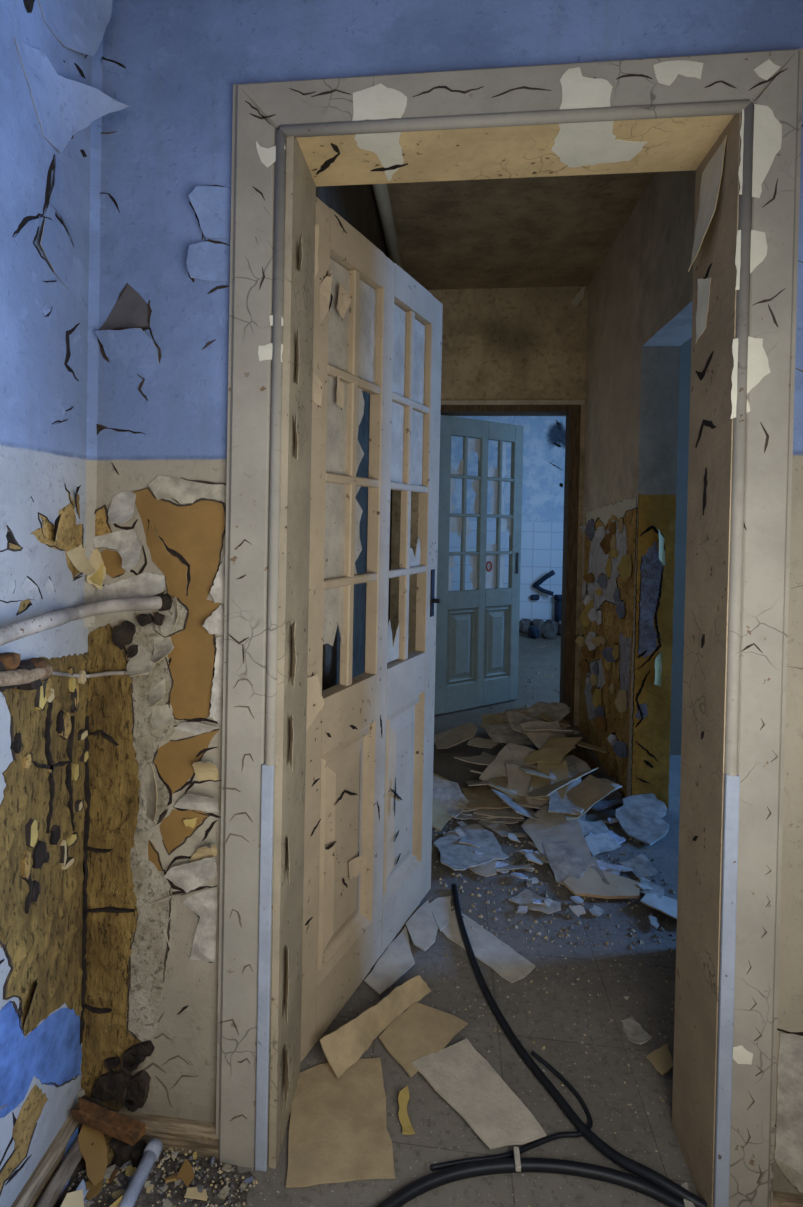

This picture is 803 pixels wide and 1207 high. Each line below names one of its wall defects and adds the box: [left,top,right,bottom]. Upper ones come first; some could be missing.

crack [12,154,78,248]
peeling [14,0,129,157]
crack [100,193,120,215]
peeling [256,141,285,168]
peeling [289,59,788,181]
peeling [688,104,786,343]
peeling [64,323,80,381]
peeling [95,283,162,401]
peeling [730,336,770,419]
flaking render [575,494,676,808]
flaking render [0,476,255,1196]
peeling [733,1028,803,1193]